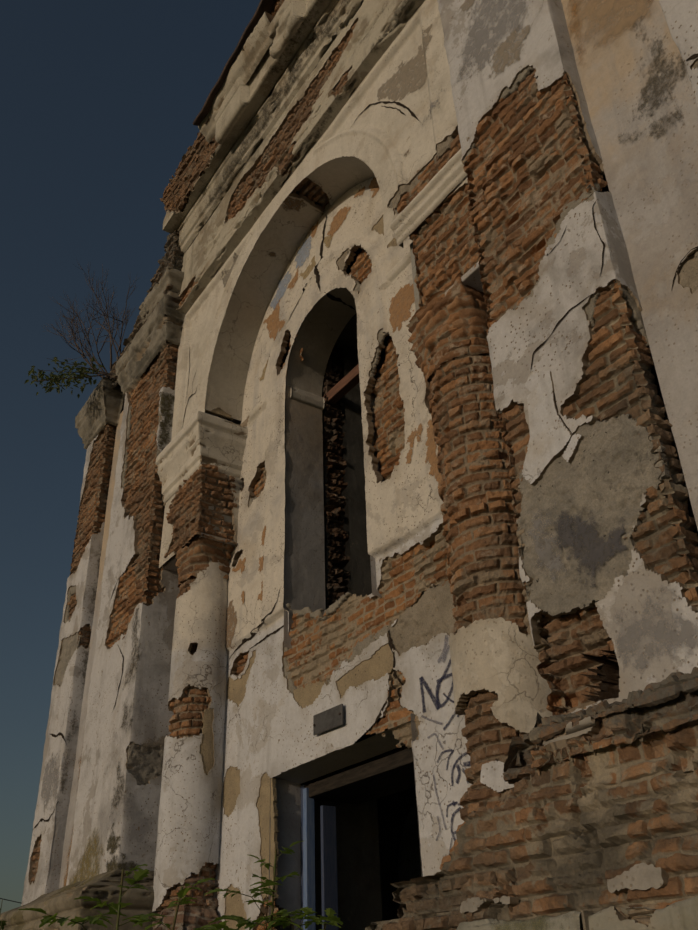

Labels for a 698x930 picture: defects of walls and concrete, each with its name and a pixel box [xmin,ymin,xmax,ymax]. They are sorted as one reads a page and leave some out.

crack [351,101,419,127]
peeling [377,24,432,101]
water stain [460,0,530,79]
water stain [638,41,686,138]
spalling [160,132,219,212]
crack [288,215,355,321]
crack [530,200,609,372]
spalling [283,66,698,748]
spalling [70,344,247,648]
spalling [55,625,91,686]
spalling [227,650,256,707]
spalling [461,691,524,791]